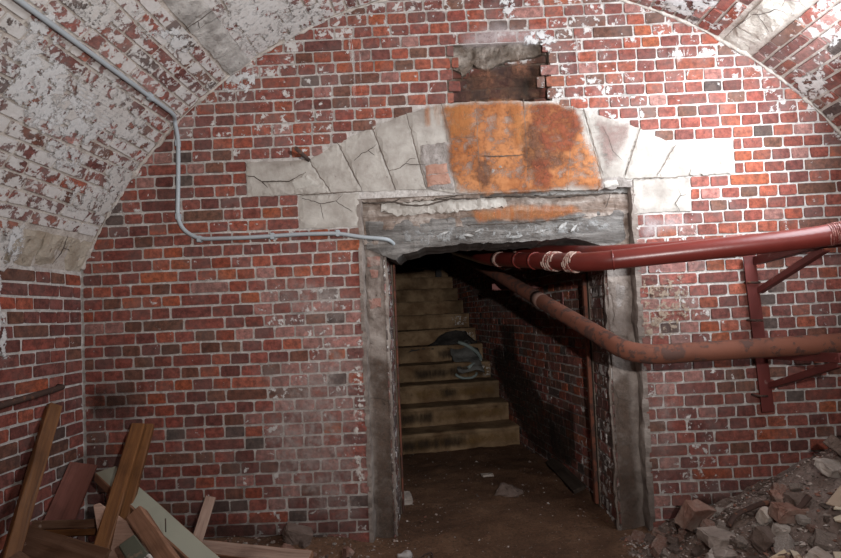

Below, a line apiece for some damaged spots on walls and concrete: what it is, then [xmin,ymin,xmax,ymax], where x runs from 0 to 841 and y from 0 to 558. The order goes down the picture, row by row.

peeling [26,11,59,58]
peeling [135,7,194,54]
crack [725,0,806,37]
water stain [458,61,542,102]
peeling [787,65,828,97]
rust [444,101,628,193]
crack [248,172,306,188]
peeling [5,226,25,261]
crack [302,192,618,219]
peeling [405,220,608,244]
rust [475,206,574,221]
crack [465,216,587,225]